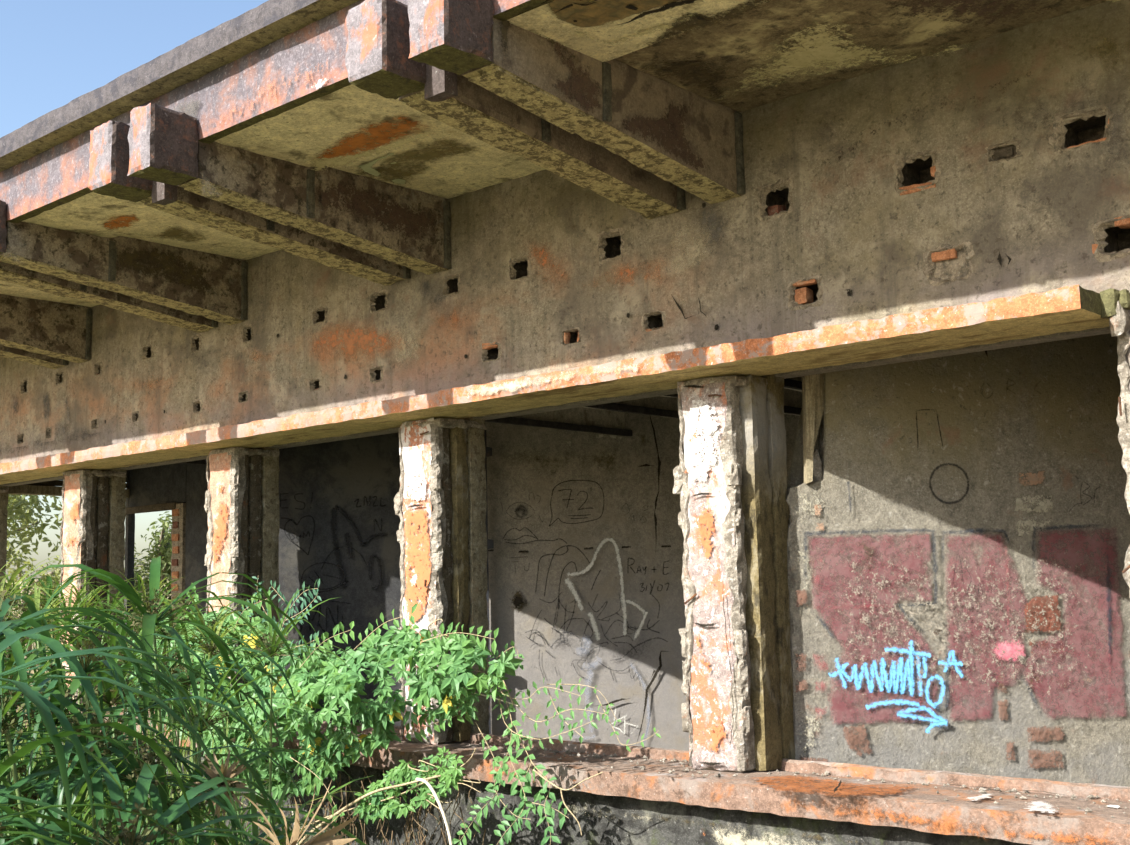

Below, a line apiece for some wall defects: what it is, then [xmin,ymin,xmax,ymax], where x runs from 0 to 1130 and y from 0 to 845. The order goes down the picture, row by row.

crack [541,0,596,15]
crack [618,0,709,25]
damp [887,0,1052,26]
damp [537,33,601,114]
damp [576,0,963,99]
corrosion [310,116,431,171]
spalling [1100,288,1130,514]
peeling [394,423,448,674]
spalling [673,381,756,771]
spalling [1122,545,1130,598]
corrosion [754,775,985,837]
corrosion [1004,830,1110,845]